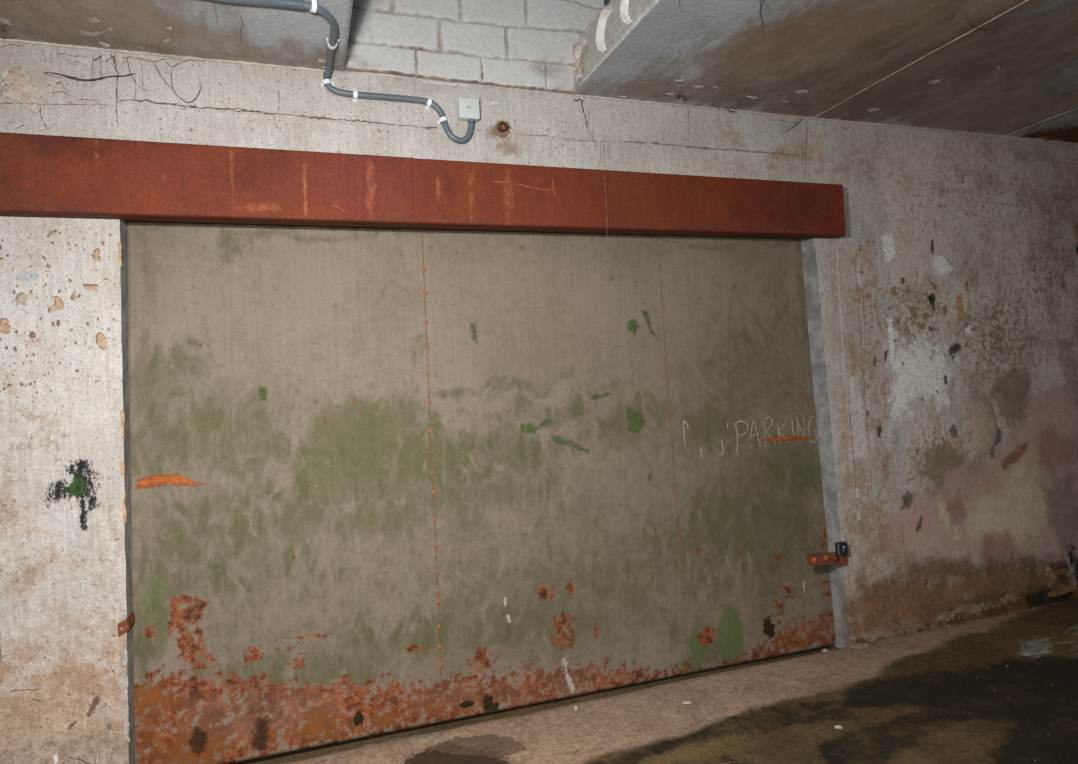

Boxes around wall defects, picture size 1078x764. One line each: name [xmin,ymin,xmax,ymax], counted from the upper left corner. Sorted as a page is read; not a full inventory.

damp [0,0,344,70]
damp [621,0,1078,122]